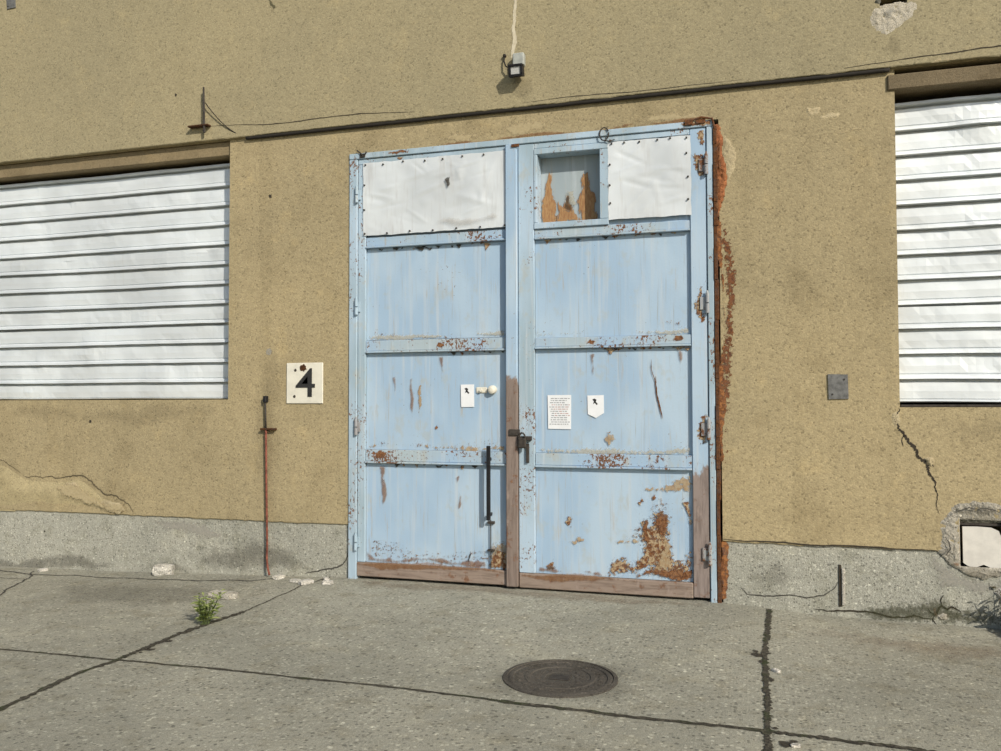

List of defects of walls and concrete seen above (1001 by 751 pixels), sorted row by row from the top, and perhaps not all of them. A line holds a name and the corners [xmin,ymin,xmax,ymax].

spalling [870,0,917,35]
corrosion [694,281,706,322]
corrosion [717,219,736,463]
crack [891,410,939,513]
corrosion [365,540,506,571]
corrosion [524,476,693,582]
corrosion [721,540,729,599]
spalling [938,501,1001,605]